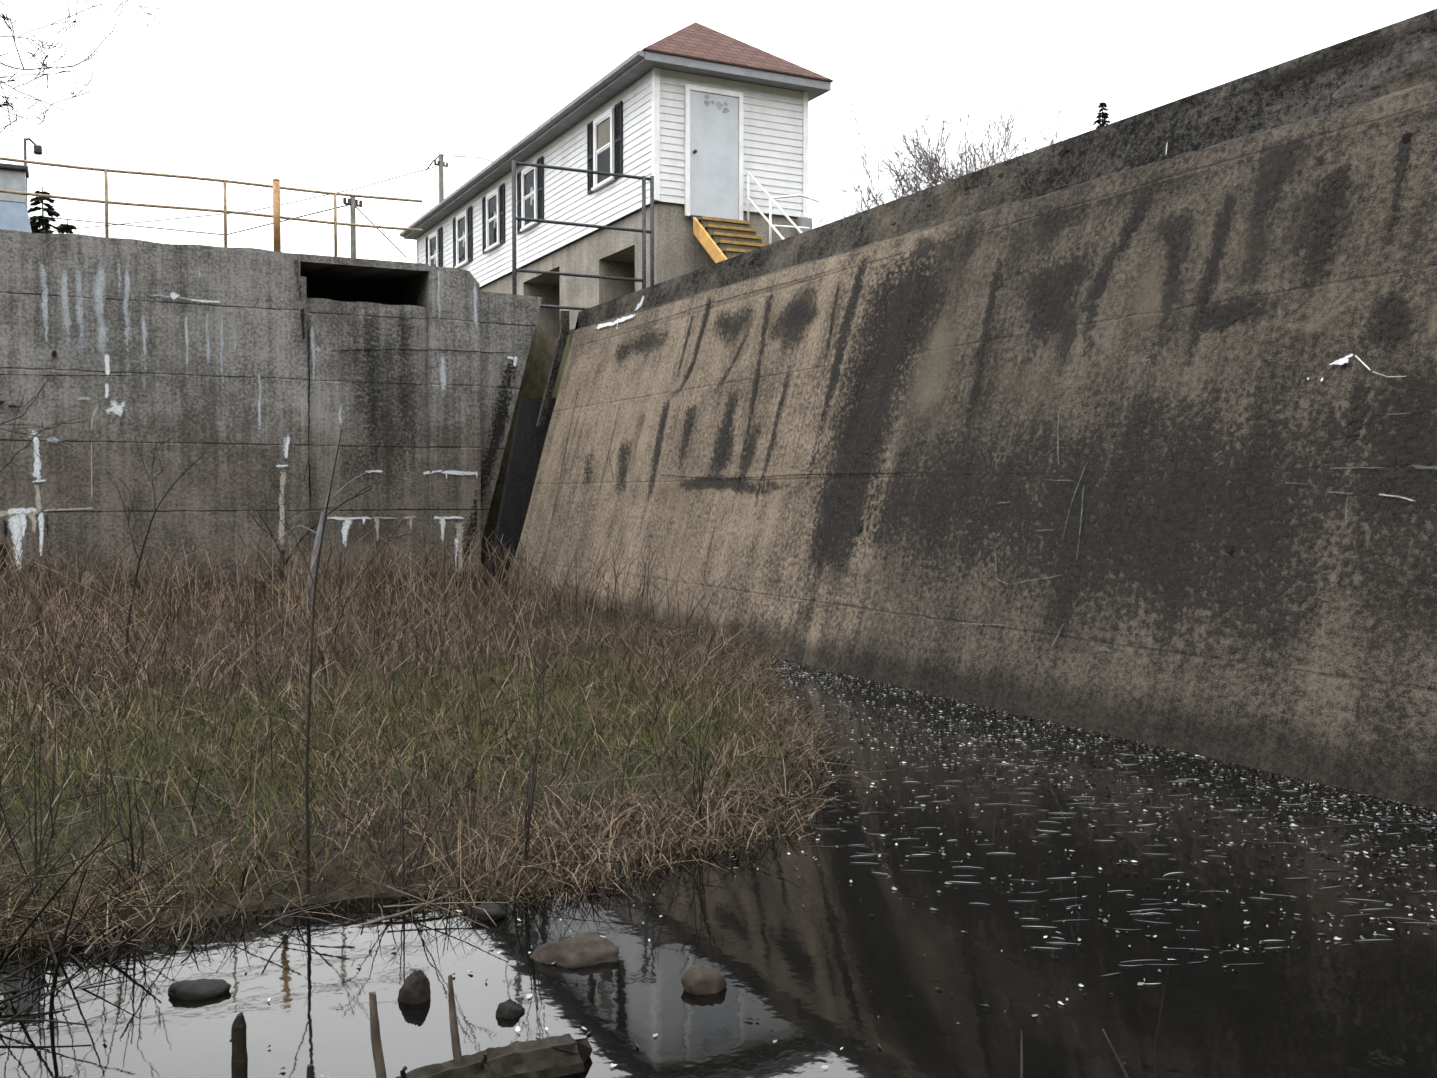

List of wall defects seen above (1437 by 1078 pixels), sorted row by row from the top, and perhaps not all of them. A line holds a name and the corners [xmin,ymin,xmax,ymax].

efflorescence [0,259,148,570]
efflorescence [151,292,237,389]
leakage [310,323,322,388]
leakage [597,296,669,362]
leakage [648,106,1437,670]
leakage [423,356,518,586]
leakage [582,450,594,487]
leakage [615,442,632,493]
leakage [327,516,416,547]